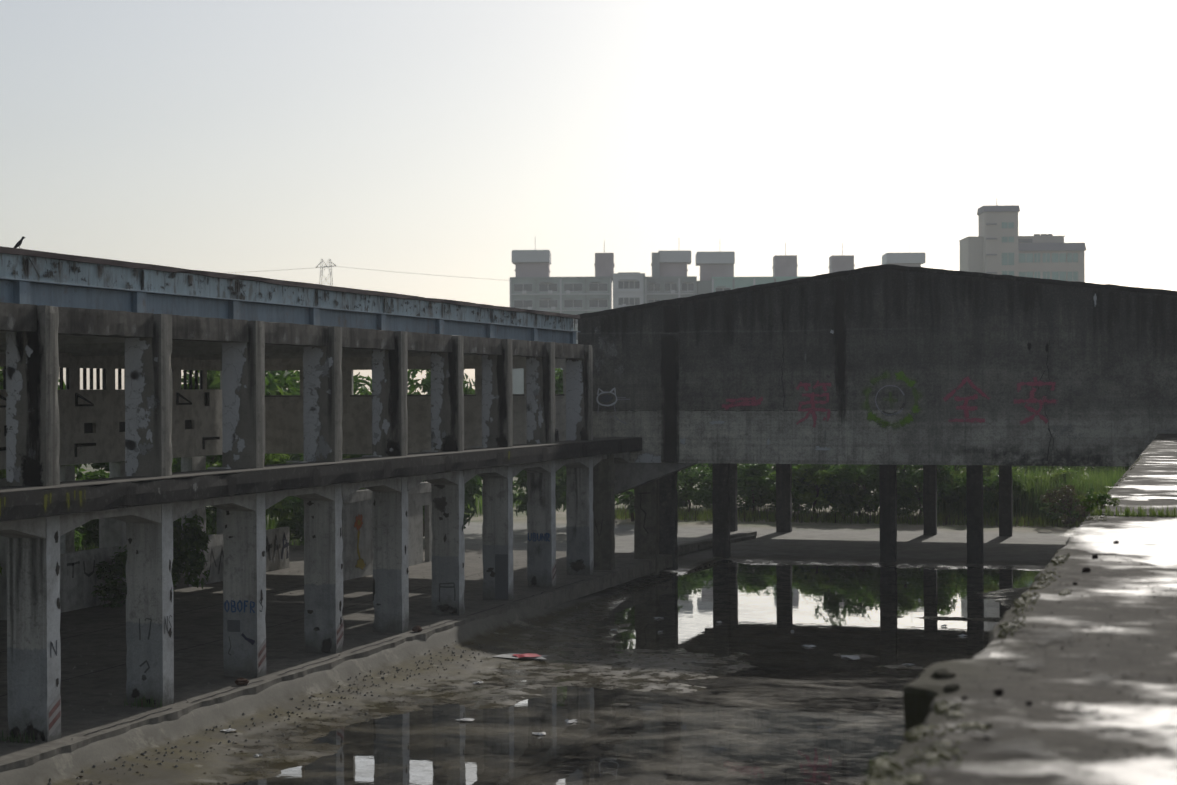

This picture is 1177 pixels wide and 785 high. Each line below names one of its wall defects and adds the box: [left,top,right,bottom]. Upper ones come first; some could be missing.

peeling [6,332,36,483]
peeling [125,338,160,476]
peeling [222,342,247,467]
peeling [303,346,333,462]
peeling [372,350,393,455]
peeling [431,353,450,450]